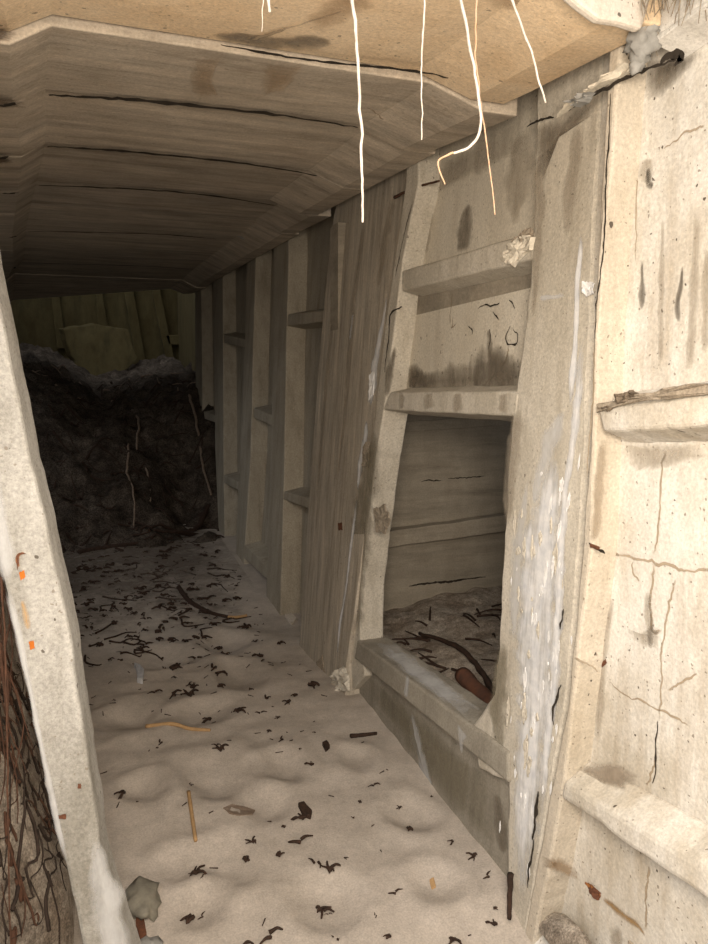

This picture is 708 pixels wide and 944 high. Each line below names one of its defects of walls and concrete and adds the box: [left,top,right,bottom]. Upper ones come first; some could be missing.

damp [410,341,514,410]
peeling [506,243,595,878]
crack [527,48,685,471]
spalling [584,765,632,786]
crack [576,455,706,784]
spalling [596,383,708,413]